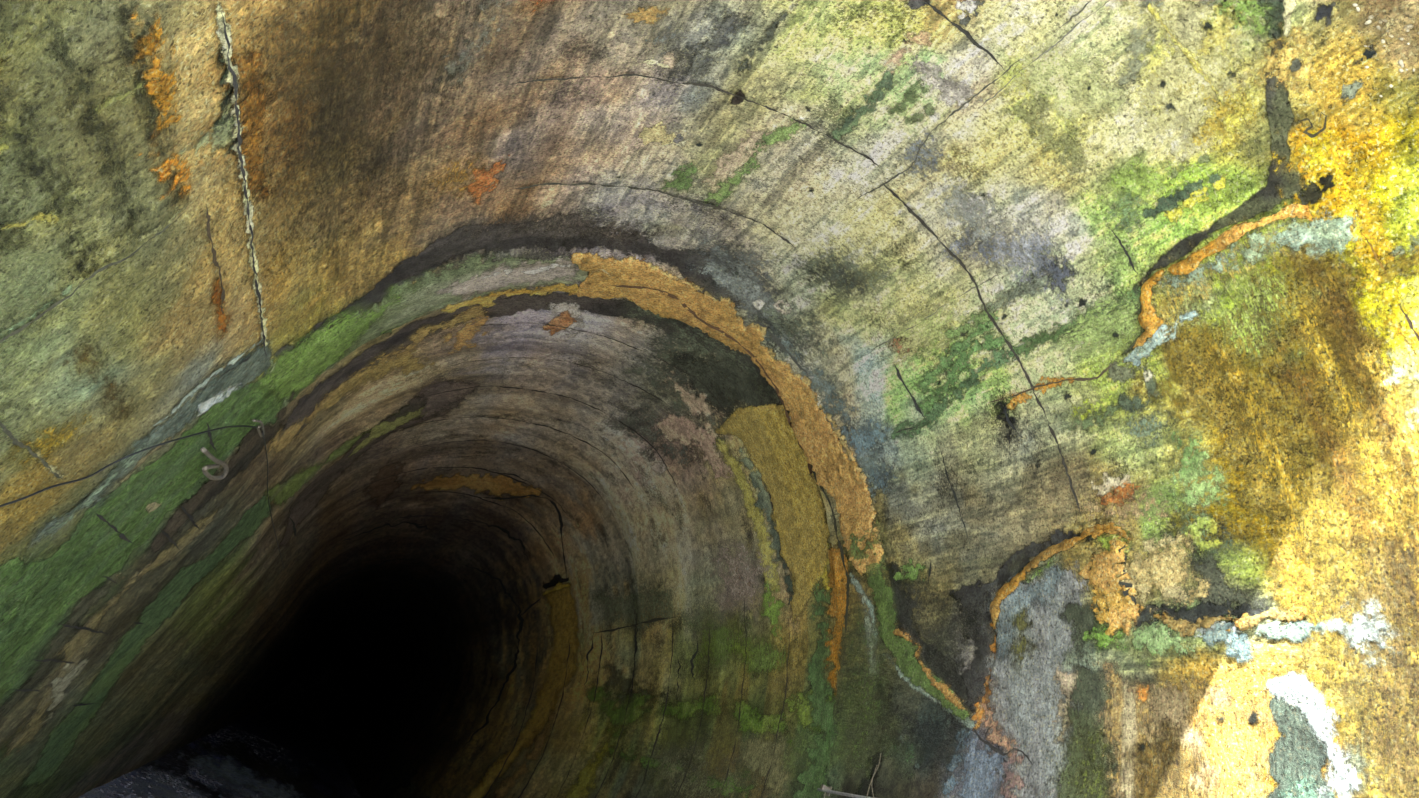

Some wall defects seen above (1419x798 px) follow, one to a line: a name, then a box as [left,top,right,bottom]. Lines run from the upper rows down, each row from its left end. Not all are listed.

crack [0,4,276,374]
corrosion [130,6,202,198]
leakage [119,0,512,273]
leakage [677,0,798,80]
crack [505,0,1110,541]
crack [1109,227,1138,274]
crack [1148,3,1225,105]
leakage [1118,0,1419,798]
spalling [1118,532,1309,637]